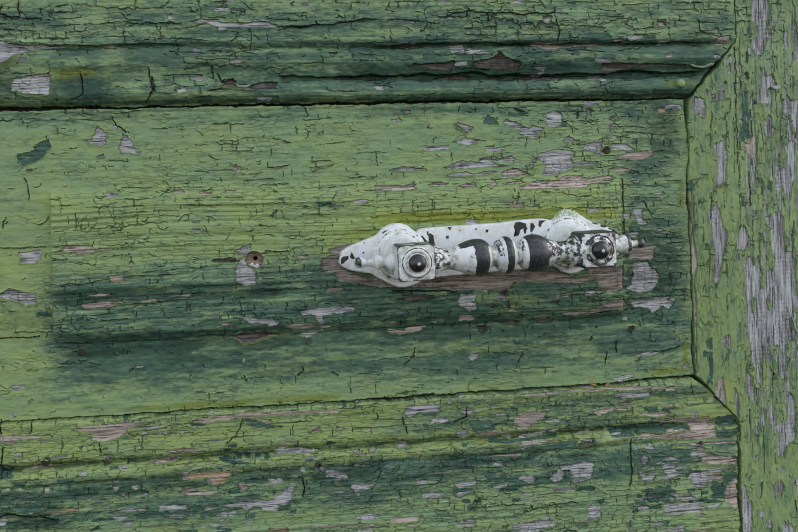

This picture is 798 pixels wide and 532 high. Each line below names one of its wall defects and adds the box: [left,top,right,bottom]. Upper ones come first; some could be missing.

crack [283,19,375,28]
crack [447,10,560,41]
peeling [12,73,51,97]
peeling [429,123,653,193]
crack [392,287,456,295]
peeling [321,242,674,335]
peeling [234,306,355,345]
peeling [510,203,798,532]
crack [370,393,434,401]
crack [1,512,58,520]
peeling [203,483,296,511]
crack [473,501,576,509]